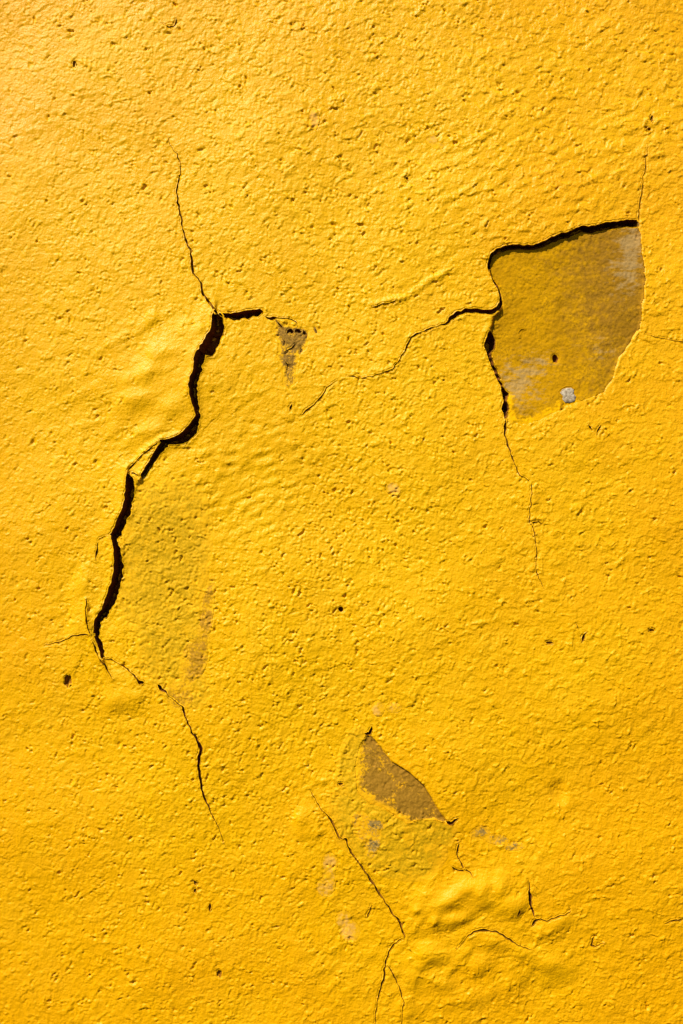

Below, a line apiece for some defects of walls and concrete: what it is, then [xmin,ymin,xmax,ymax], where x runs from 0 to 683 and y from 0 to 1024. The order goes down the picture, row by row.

peeling [274,320,317,389]
crack [288,274,503,417]
spalling [483,114,654,484]
crack [43,136,298,847]
crack [527,481,545,589]
peeling [337,725,460,826]
crack [309,789,406,1024]
crack [450,841,474,879]
crack [456,878,571,951]